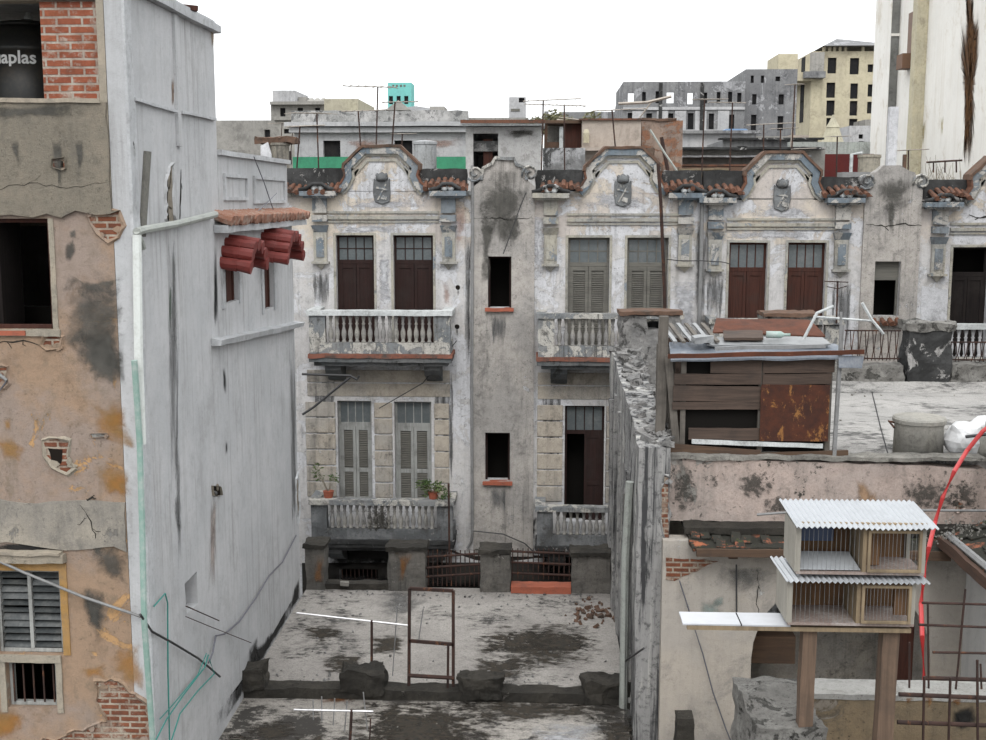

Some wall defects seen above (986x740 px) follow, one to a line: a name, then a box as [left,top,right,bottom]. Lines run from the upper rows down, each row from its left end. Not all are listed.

rust [961,0,978,154]
flaking render [85,208,127,245]
leakage [482,174,518,278]
crack [867,223,922,231]
leakage [70,282,122,380]
leakage [493,319,506,339]
spalling [0,363,12,390]
spalling [41,436,78,477]
leakage [674,470,697,509]
leakage [740,473,786,512]
flaking render [40,676,150,740]